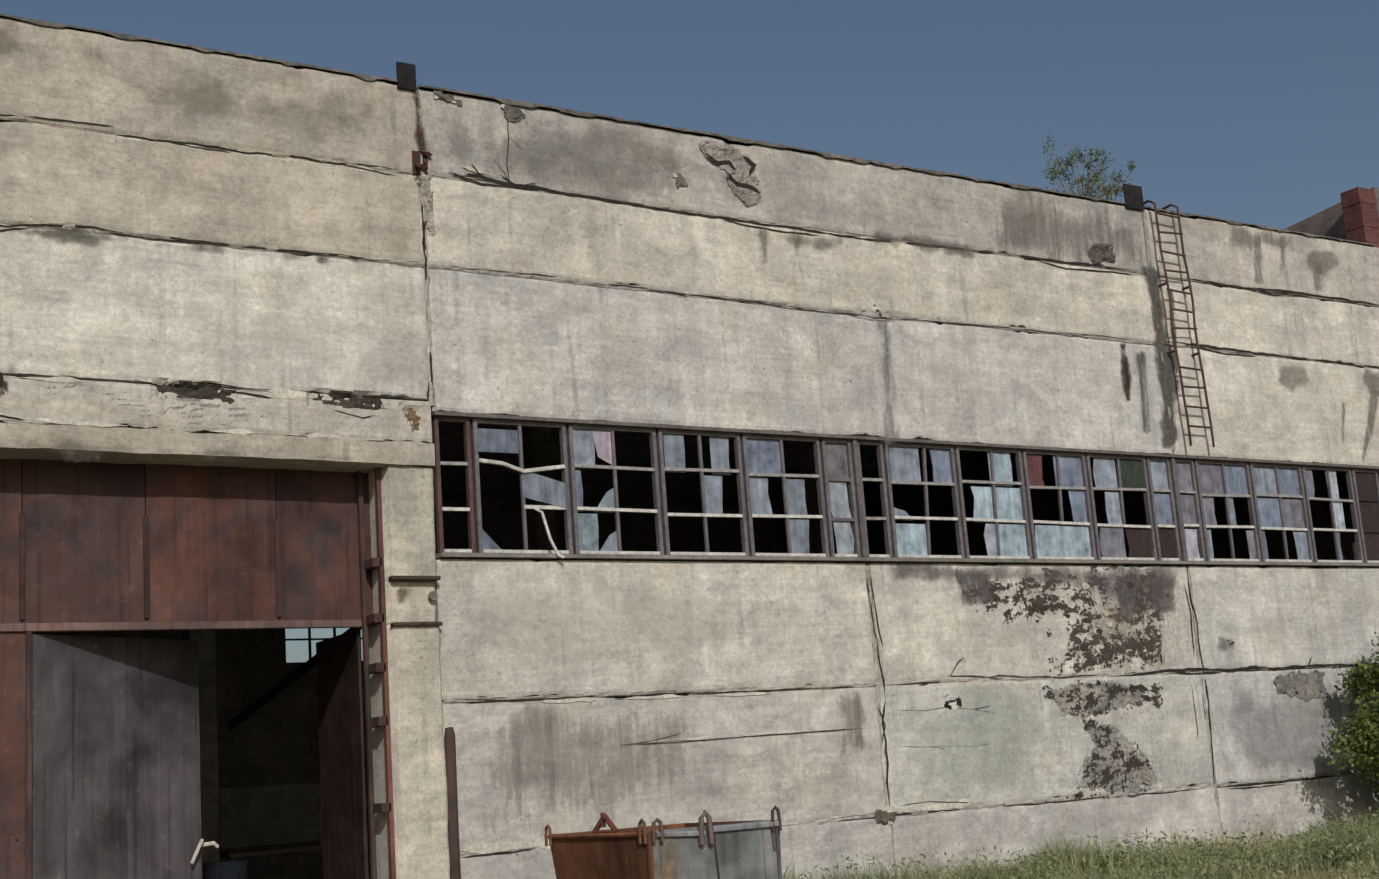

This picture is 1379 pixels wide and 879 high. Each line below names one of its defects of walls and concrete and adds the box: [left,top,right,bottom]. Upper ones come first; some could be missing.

spalling [700,141,762,207]
crack [0,114,1143,339]
crack [1184,277,1378,305]
crack [426,317,434,398]
leakage [1137,267,1179,447]
crack [1166,338,1379,368]
spalling [41,380,285,425]
spalling [308,390,381,418]
leakage [1362,370,1379,458]
crack [466,577,1359,822]
peeling [962,559,1163,800]
spalling [1274,670,1329,701]